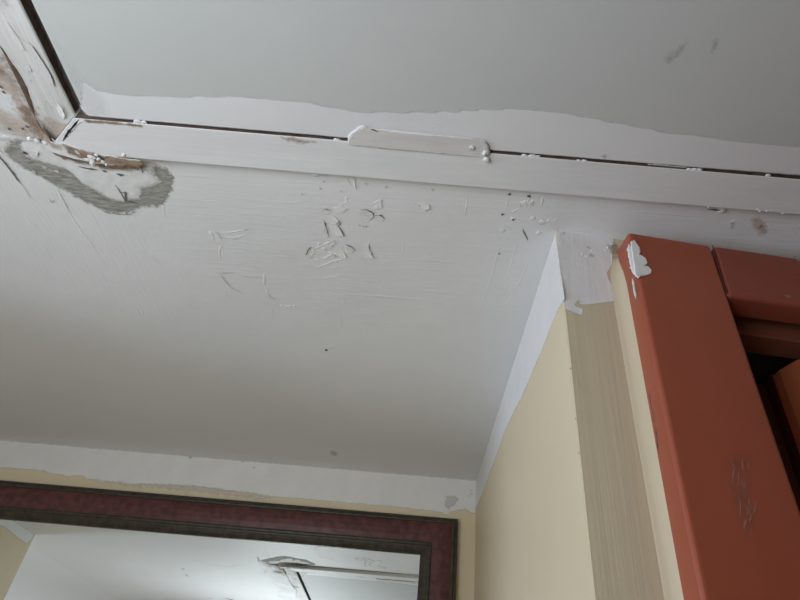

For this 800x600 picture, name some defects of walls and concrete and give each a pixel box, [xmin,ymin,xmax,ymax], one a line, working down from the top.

flaking render [0,48,174,215]